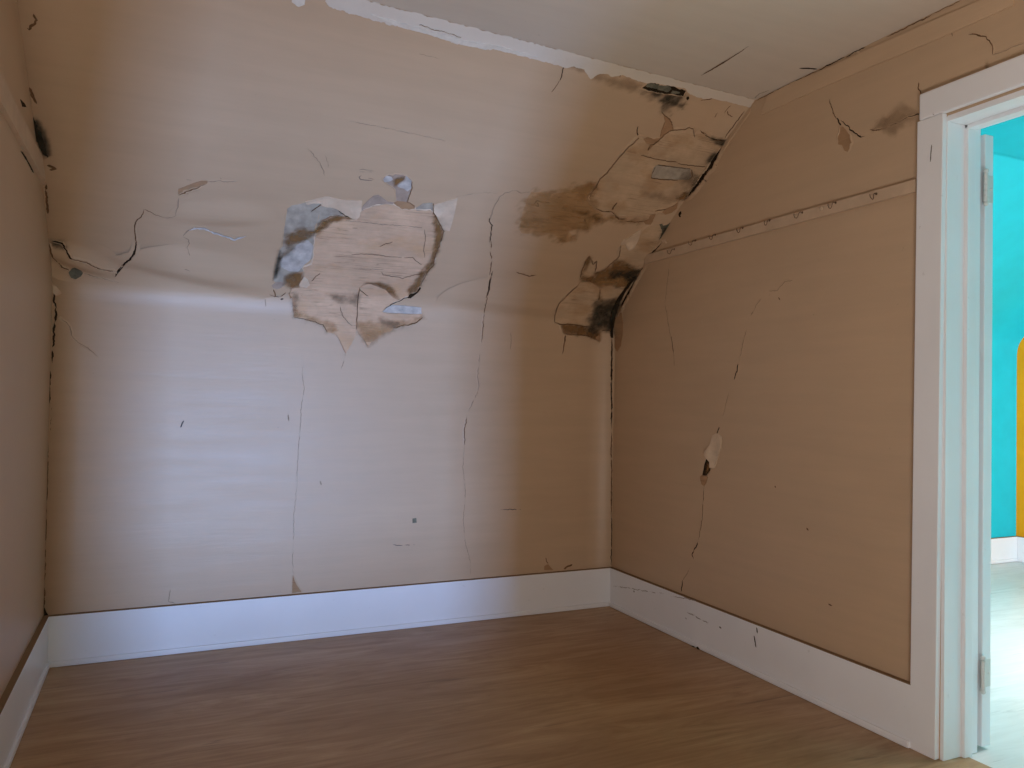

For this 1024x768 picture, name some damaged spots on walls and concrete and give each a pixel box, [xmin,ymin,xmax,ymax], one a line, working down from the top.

crack [757,1,1024,100]
crack [44,179,246,584]
crack [291,368,305,594]
peeling [265,173,458,369]
crack [462,189,536,574]
crack [610,238,667,562]
peeling [552,113,726,356]
crack [686,146,723,202]